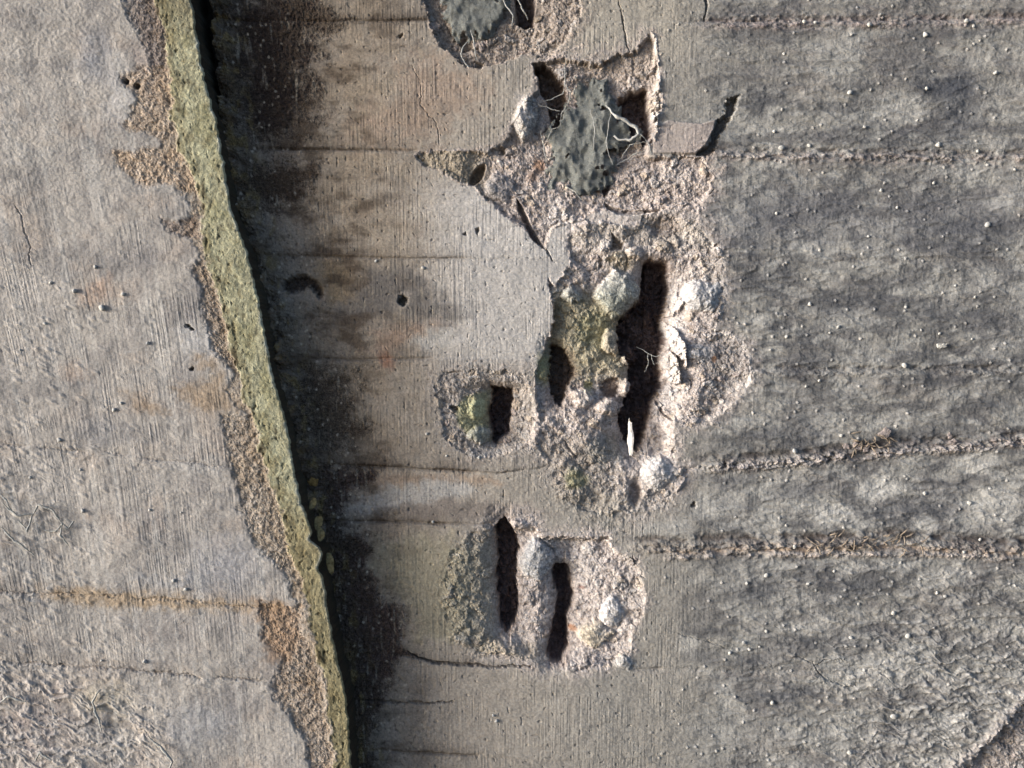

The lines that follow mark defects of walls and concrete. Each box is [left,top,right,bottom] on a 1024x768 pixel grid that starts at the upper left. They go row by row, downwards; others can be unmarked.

leakage [210,0,354,221]
leakage [327,258,486,351]
spalling [414,0,754,520]
leakage [279,355,561,768]
spalling [439,515,649,673]